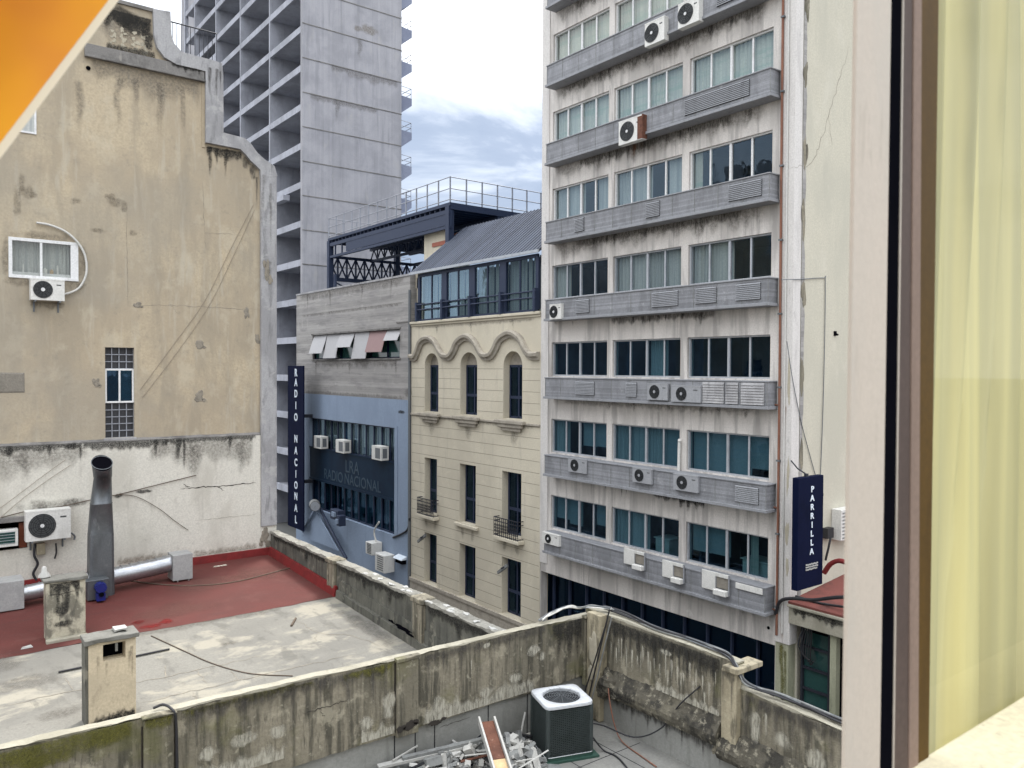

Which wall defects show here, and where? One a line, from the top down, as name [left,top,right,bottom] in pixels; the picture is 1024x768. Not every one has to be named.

leakage [104,7,155,58]
leakage [207,147,257,182]
leakage [0,435,255,456]
crack [184,482,255,491]
leakage [428,606,581,669]
leakage [609,621,734,716]
leakage [361,694,395,743]
leakage [425,674,532,723]
leakage [603,688,712,748]
leakage [746,697,841,768]